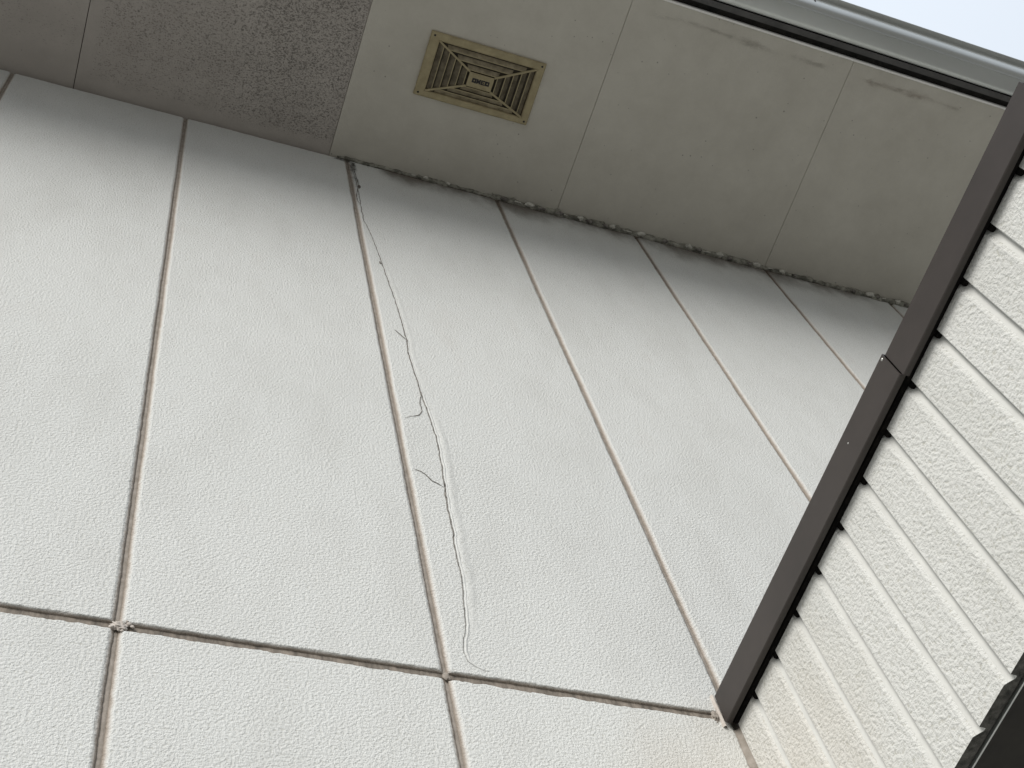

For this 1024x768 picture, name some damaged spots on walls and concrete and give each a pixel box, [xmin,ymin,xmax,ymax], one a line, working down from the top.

crack [351,167,486,671]